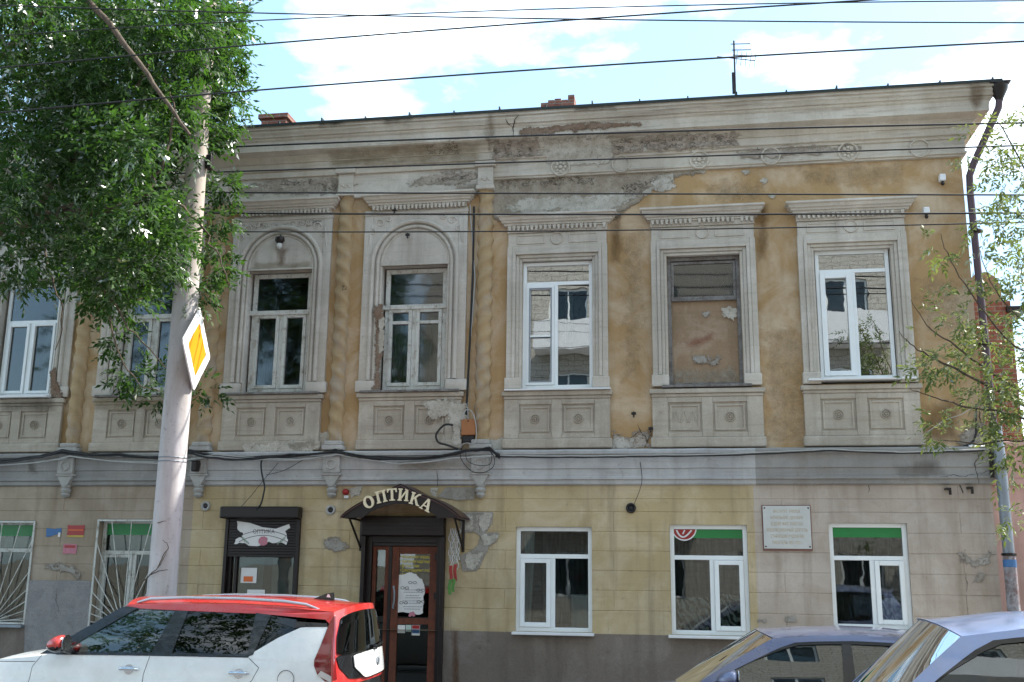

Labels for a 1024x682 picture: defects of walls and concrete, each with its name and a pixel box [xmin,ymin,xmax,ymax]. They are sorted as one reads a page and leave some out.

peeling [406,169,478,187]
peeling [490,120,862,222]
flaking render [371,303,385,390]
peeling [424,397,468,446]
peeling [611,426,653,449]
flaking render [430,487,499,572]